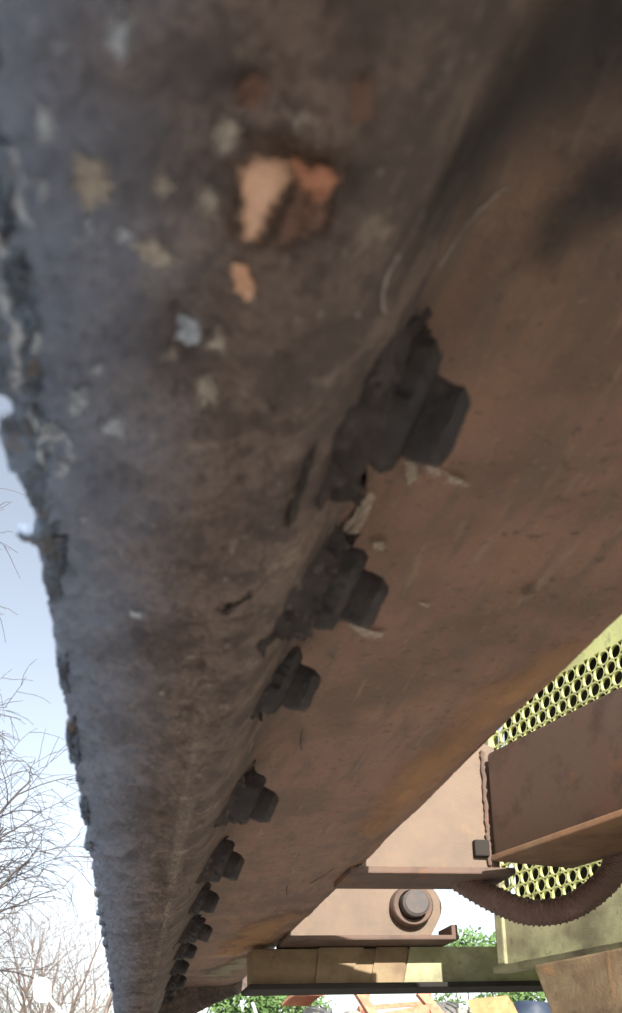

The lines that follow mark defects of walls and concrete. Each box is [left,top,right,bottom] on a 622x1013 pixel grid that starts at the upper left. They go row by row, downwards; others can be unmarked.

peeling [234,138,339,248]
peeling [231,263,255,302]